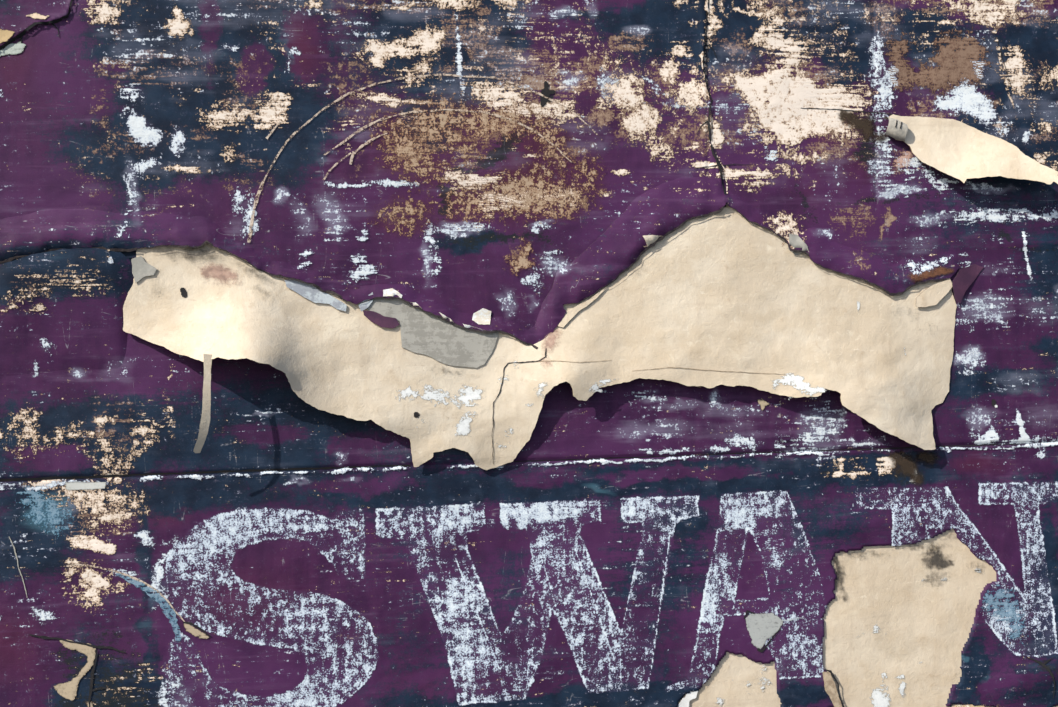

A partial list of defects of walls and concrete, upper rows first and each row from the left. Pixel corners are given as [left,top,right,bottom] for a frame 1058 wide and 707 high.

crack [0,0,73,56]
peeling [904,0,1045,31]
crack [694,0,743,207]
peeling [995,45,1058,98]
peeling [884,114,1058,184]
peeling [0,0,984,470]
flaking render [823,529,1001,707]
flaking render [678,652,782,707]